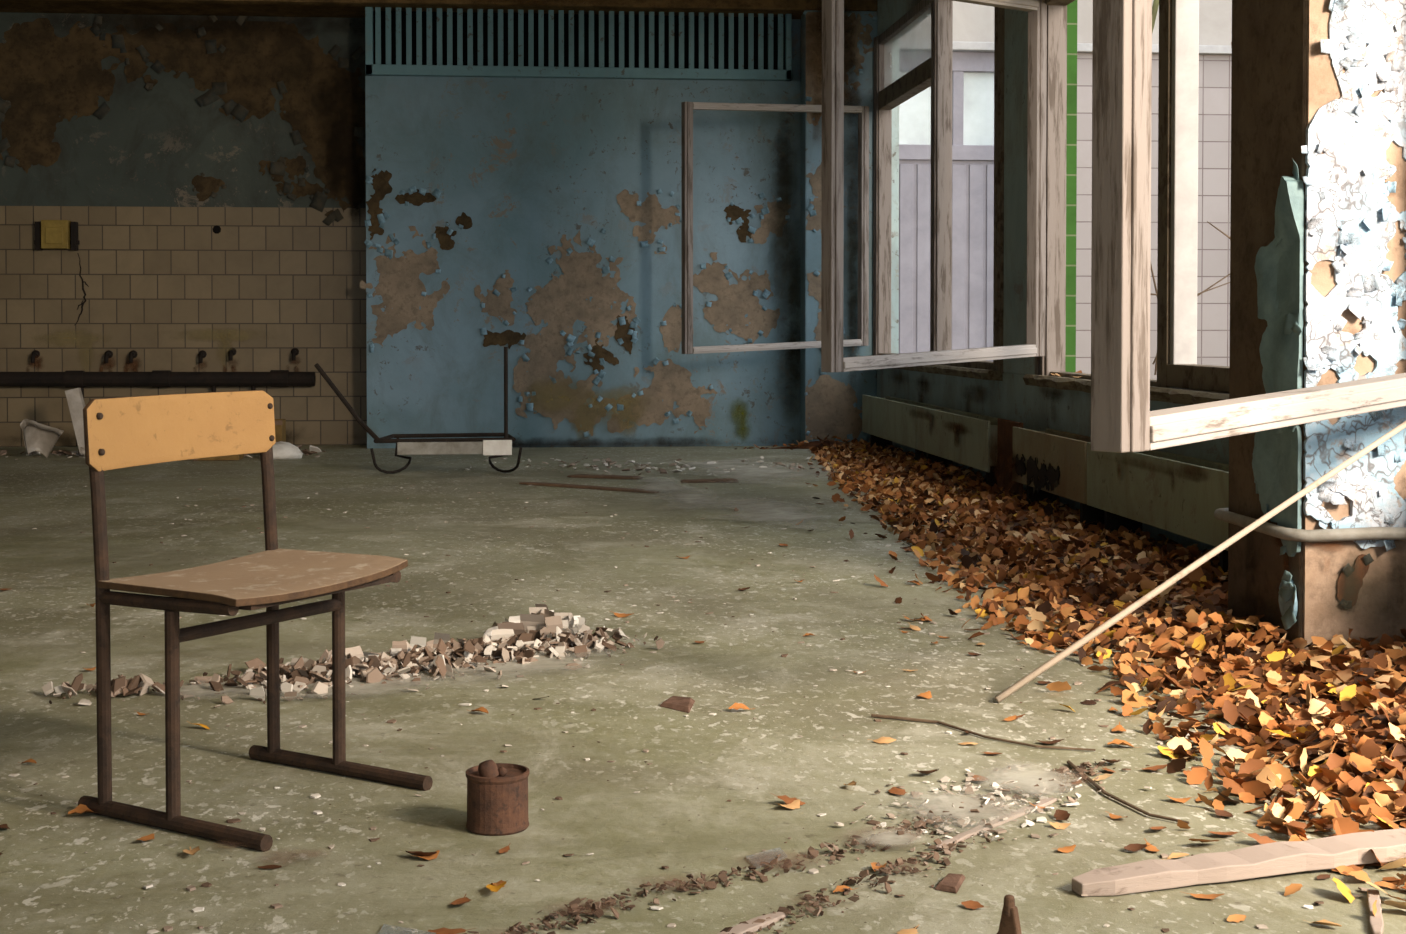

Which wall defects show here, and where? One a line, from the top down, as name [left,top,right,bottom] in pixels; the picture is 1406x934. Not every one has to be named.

peeling [0,15,473,353]
water stain [321,61,366,212]
peeling [616,189,681,254]
peeling [724,162,822,244]
water stain [844,87,854,106]
water stain [847,139,858,249]
peeling [1254,0,1406,394]
peeling [474,228,718,437]
peeling [693,252,780,344]
peeling [807,270,821,350]
peeling [804,367,869,443]
peeling [1252,406,1406,630]